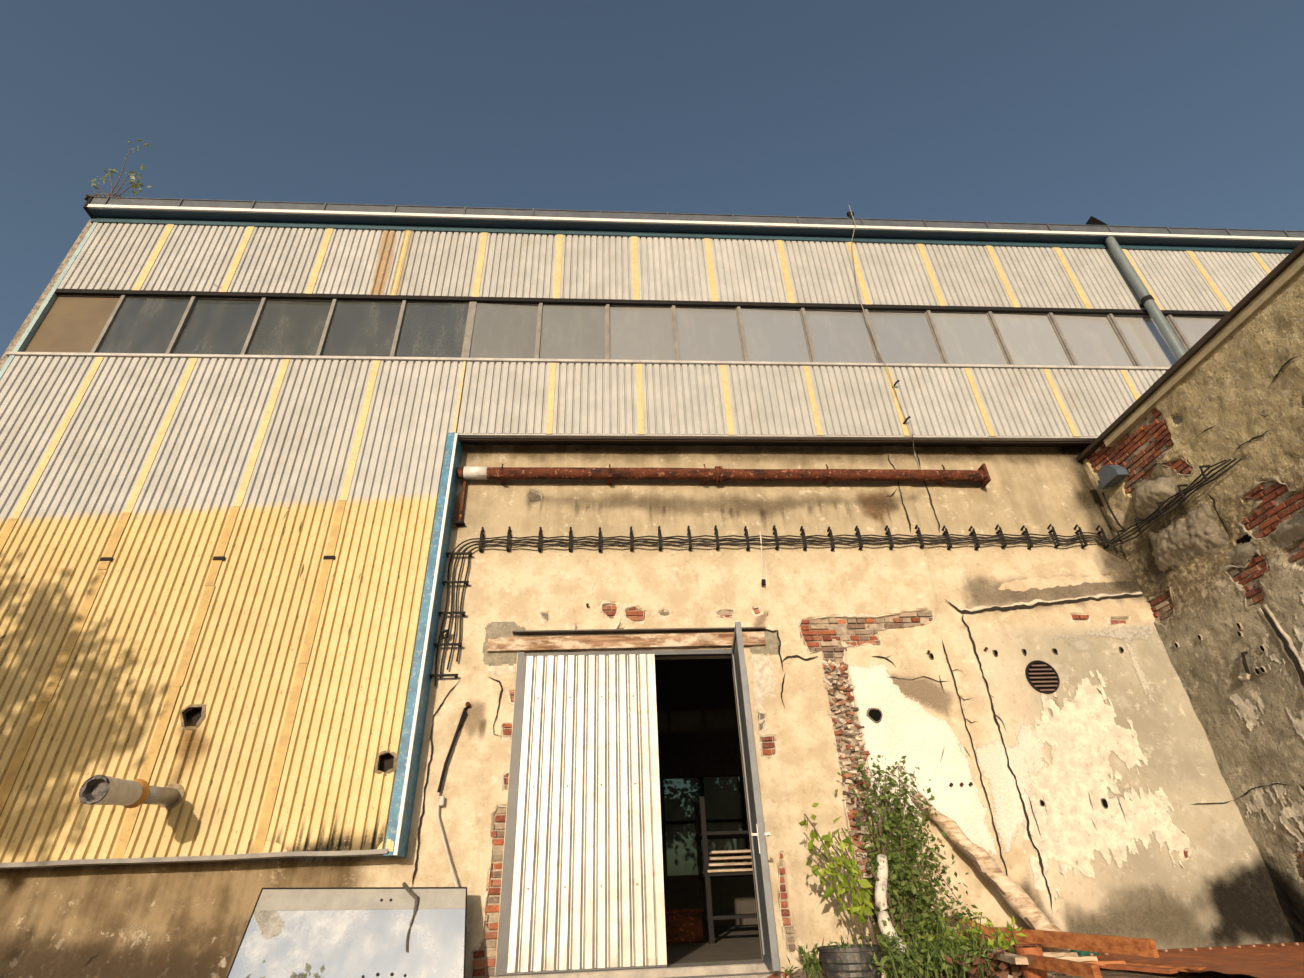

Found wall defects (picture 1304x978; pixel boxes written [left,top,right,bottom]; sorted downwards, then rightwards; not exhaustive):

spalling [1087,408,1194,495]
spalling [1222,475,1304,638]
spalling [600,600,672,629]
spalling [797,609,936,667]
peeling [1230,590,1304,731]
crack [1258,604,1304,699]
spalling [470,770,509,978]
crack [872,590,1144,908]
peeling [1009,670,1192,899]
damp [1067,857,1304,948]
peeling [1245,781,1304,879]
peeling [1285,706,1304,739]